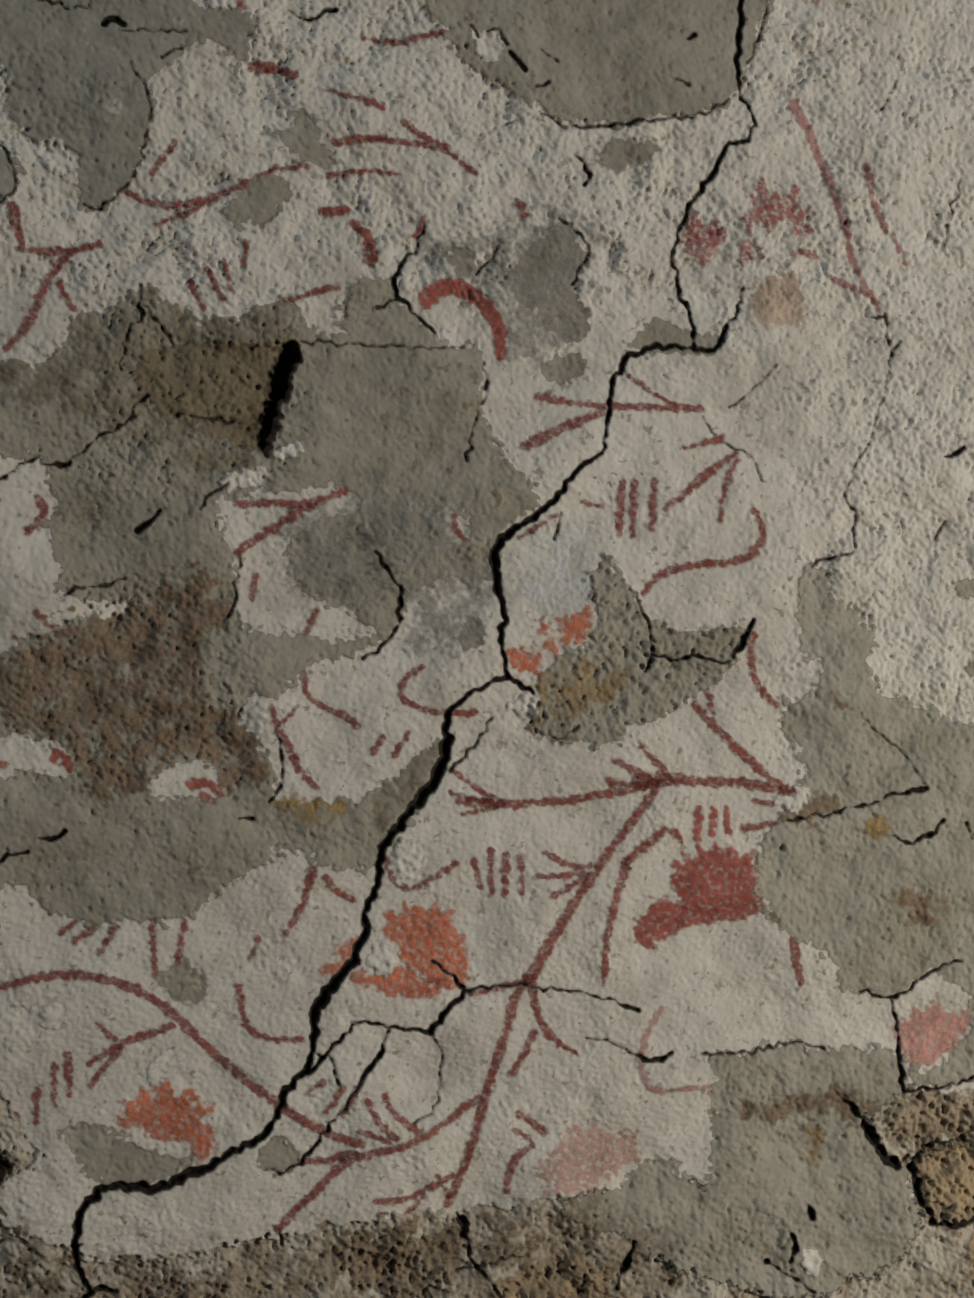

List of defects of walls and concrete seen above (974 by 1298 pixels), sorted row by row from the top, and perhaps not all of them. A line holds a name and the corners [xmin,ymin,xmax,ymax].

flaking render [0,0,259,213]
spalling [222,174,292,234]
spalling [267,108,336,170]
flaking render [425,0,774,173]
flaking render [0,275,541,930]
crack [64,0,767,1298]
crack [787,712,929,821]
flaking render [0,554,974,1298]
crack [585,1037,826,1063]
crack [859,959,974,1093]
crack [836,1091,974,1229]
crack [764,1204,816,1294]